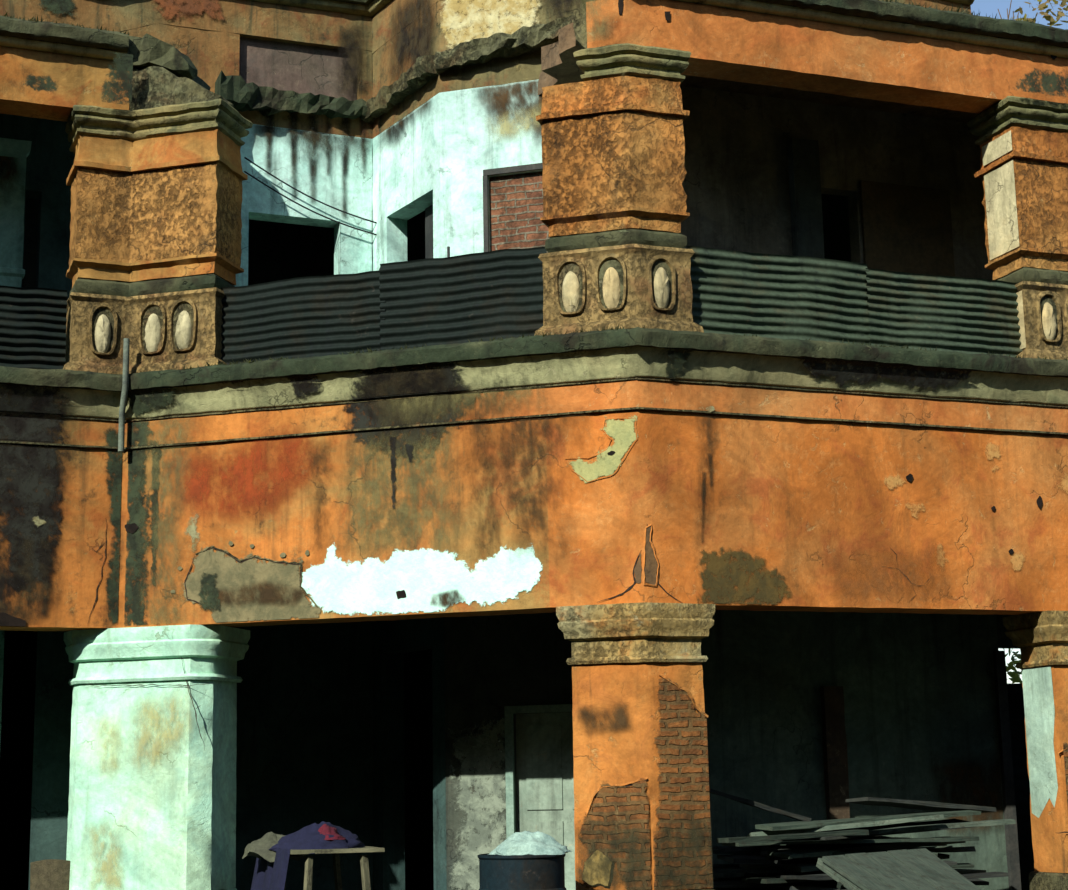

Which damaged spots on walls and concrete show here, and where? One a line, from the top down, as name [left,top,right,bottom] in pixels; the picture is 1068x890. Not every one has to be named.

peeling [440,0,541,49]
damp [255,112,366,216]
damp [800,357,972,391]
damp [0,383,69,618]
damp [343,361,530,549]
damp [504,417,560,535]
peeling [564,415,638,483]
spalling [170,541,321,623]
peeling [432,591,461,607]
damp [697,547,791,605]
spalling [579,673,713,890]
spalling [1058,743,1068,806]